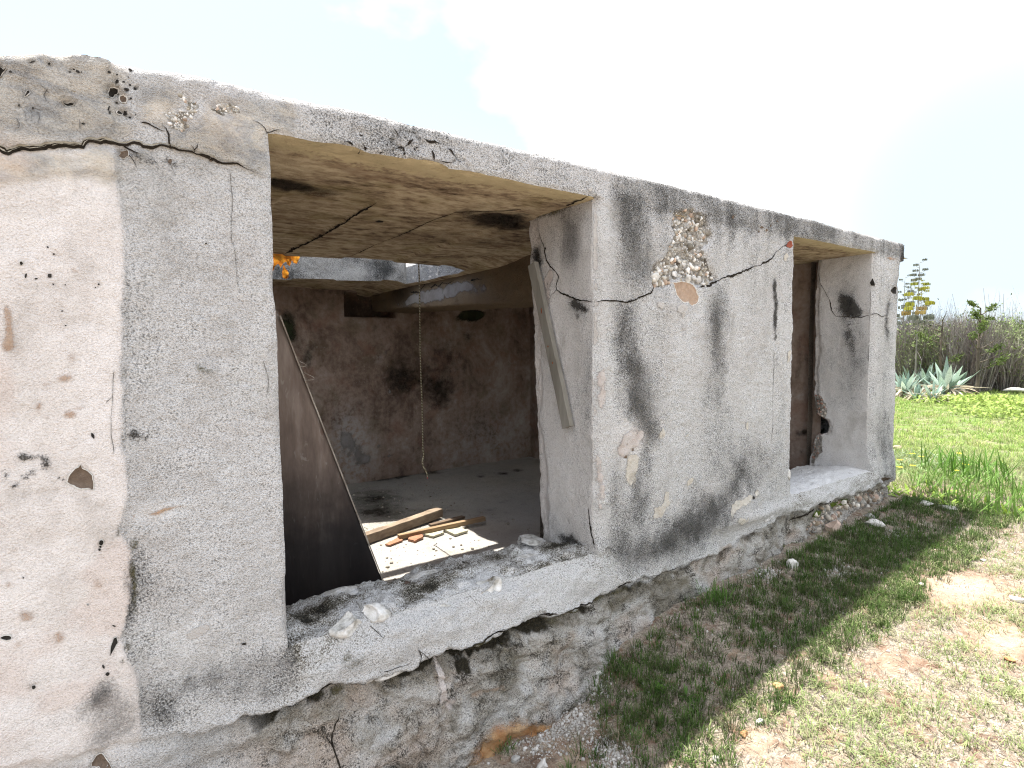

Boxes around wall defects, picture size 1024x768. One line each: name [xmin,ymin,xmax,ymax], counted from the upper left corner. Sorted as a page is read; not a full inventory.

spalling [164,93,240,132]
crack [0,85,267,291]
crack [285,203,376,254]
leakage [468,213,525,230]
crack [539,235,659,303]
spalling [650,208,713,306]
crack [818,274,884,318]
leakage [838,293,862,357]
spalling [815,394,827,419]
peeling [617,429,644,488]
spalling [811,433,823,463]